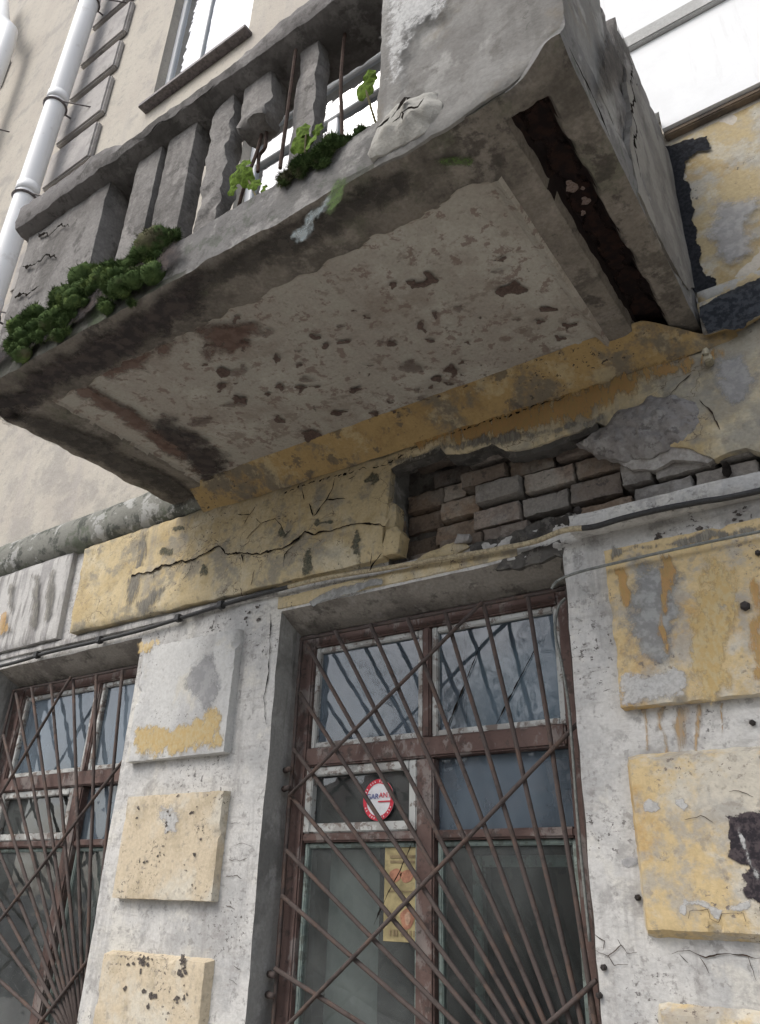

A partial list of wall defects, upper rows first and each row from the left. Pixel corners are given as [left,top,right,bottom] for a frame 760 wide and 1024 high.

crack [15,223,69,298]
peeling [389,271,439,290]
peeling [491,256,528,297]
leakage [0,172,409,505]
peeling [202,340,247,407]
leakage [388,414,604,466]
crack [131,446,418,595]
flaking render [392,423,760,563]
flaking render [495,539,564,571]
peeling [679,811,760,923]
crack [594,934,637,966]
crack [672,950,758,979]